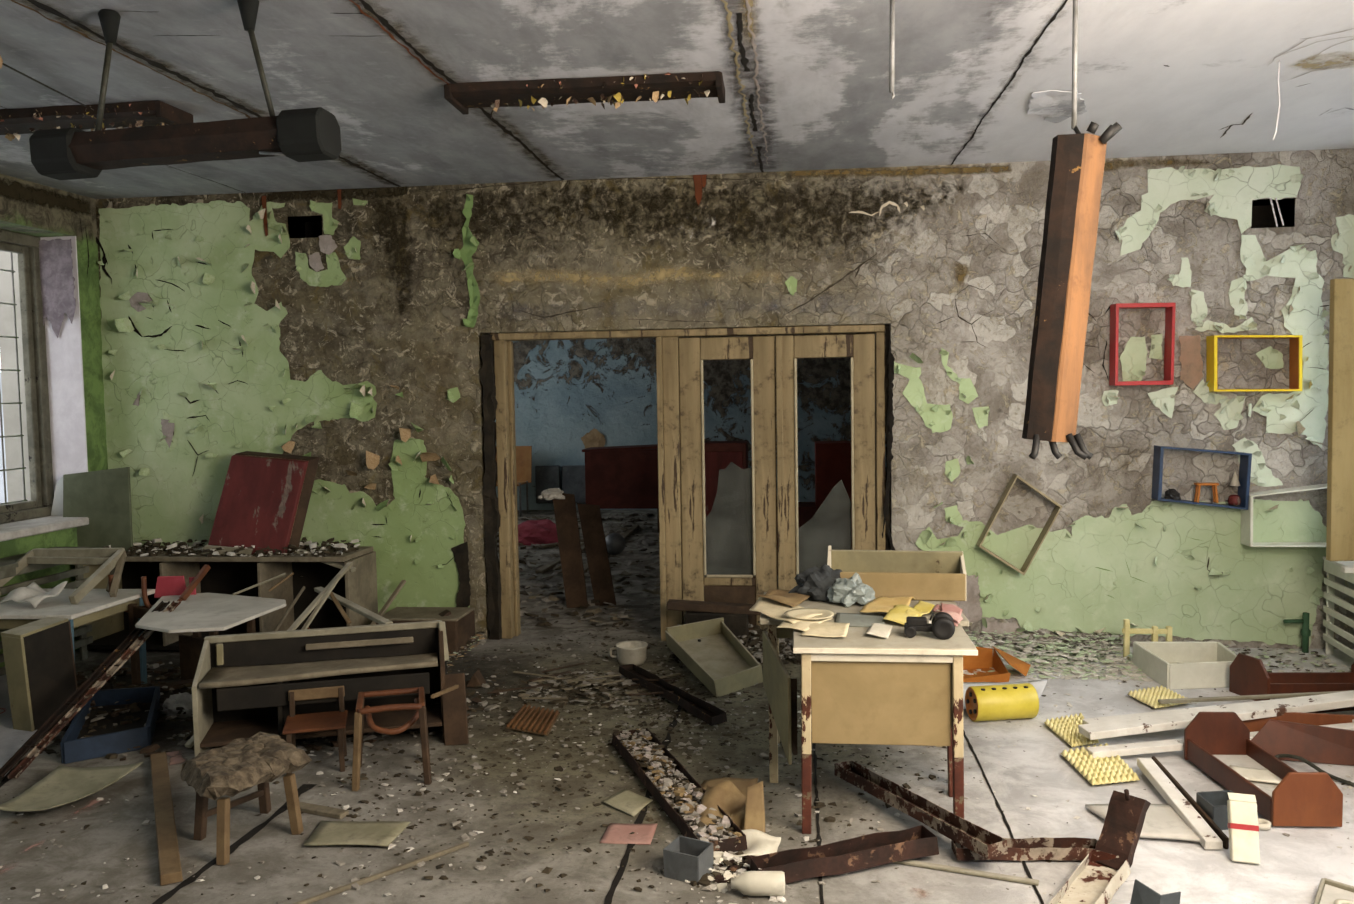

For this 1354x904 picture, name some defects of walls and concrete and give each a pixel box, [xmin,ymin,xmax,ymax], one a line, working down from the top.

leakage [1267,28,1354,79]
crack [80,220,247,477]
peeling [98,200,404,546]
leakage [267,186,416,315]
peeling [290,194,502,640]
leakage [498,266,723,287]
leakage [429,164,1011,254]
crack [786,254,876,314]
crack [882,325,895,550]
peeling [884,325,990,550]
crack [937,285,992,347]
peeling [915,164,1330,647]